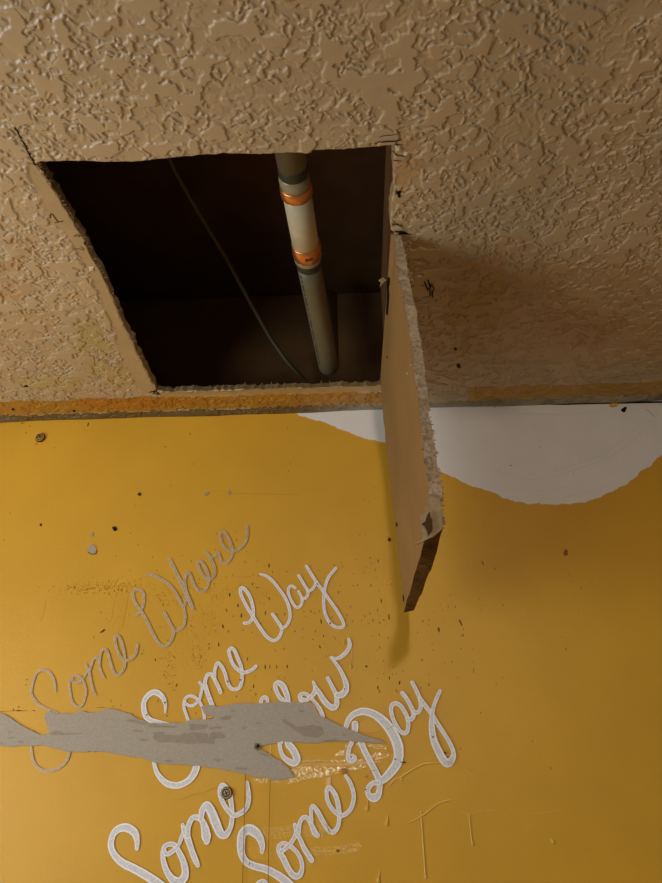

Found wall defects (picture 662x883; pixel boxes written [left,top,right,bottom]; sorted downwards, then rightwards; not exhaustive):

peeling [0,701,384,780]